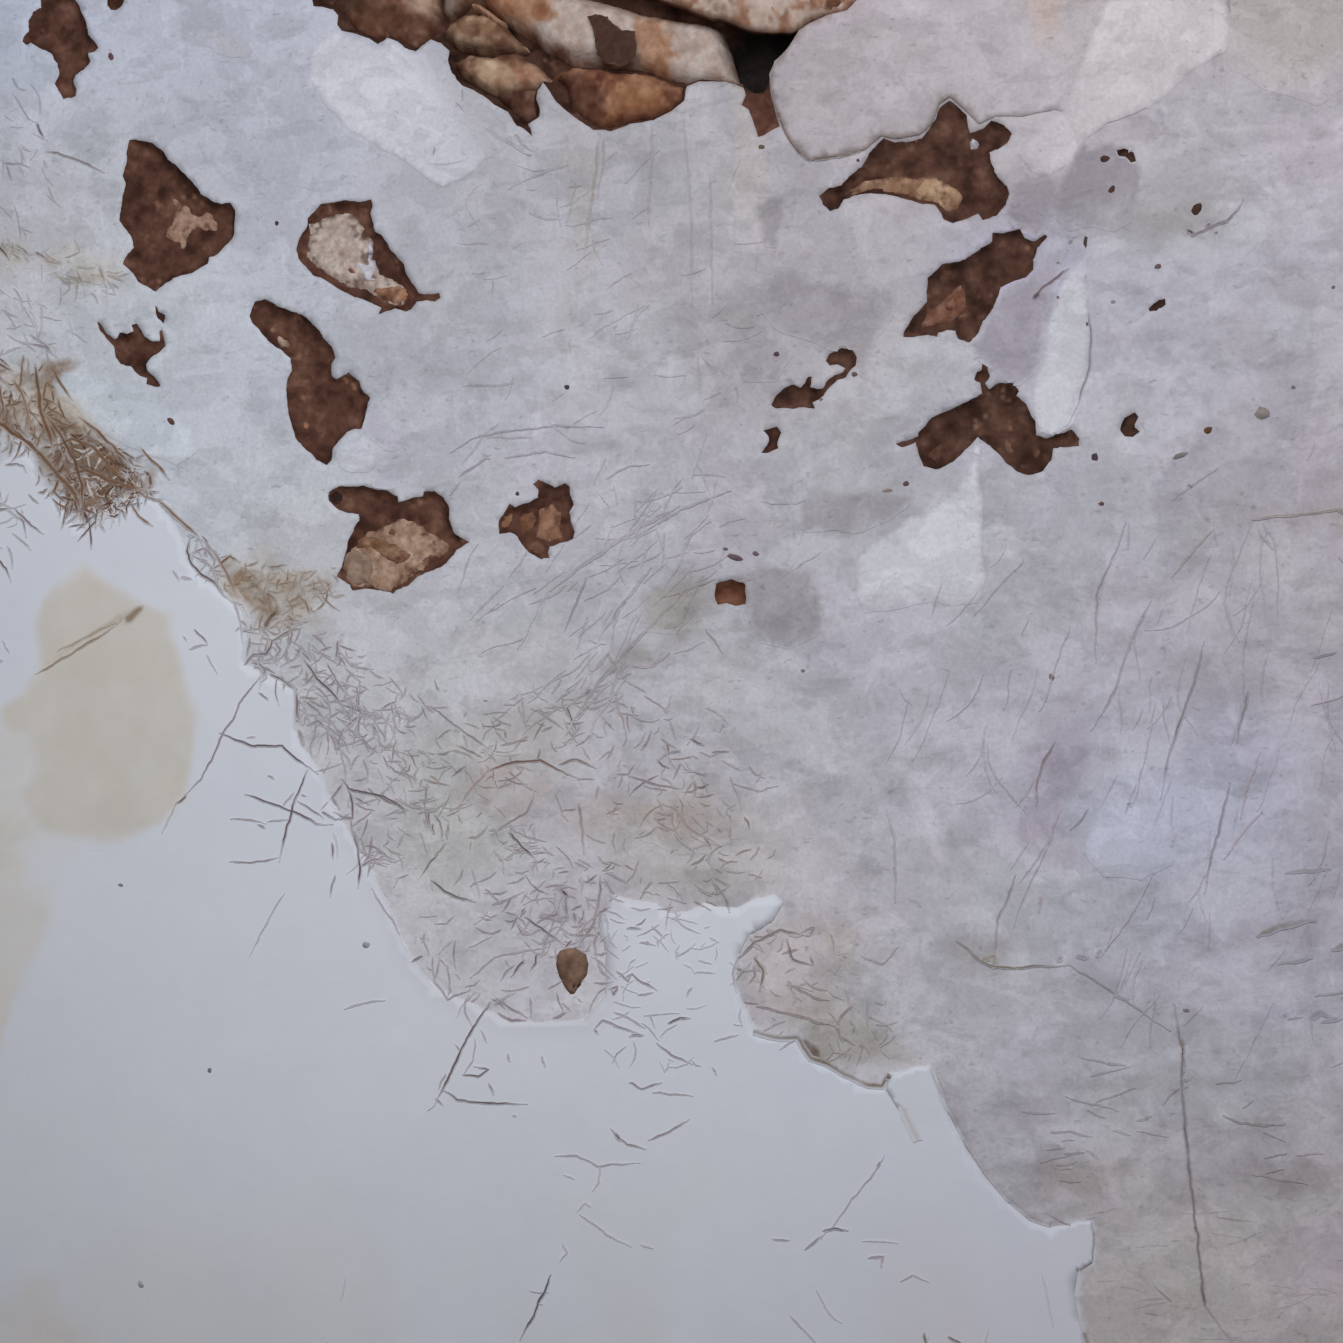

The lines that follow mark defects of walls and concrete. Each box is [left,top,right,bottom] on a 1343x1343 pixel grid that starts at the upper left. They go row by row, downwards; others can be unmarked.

spalling [22,0,114,99]
spalling [309,0,796,187]
spalling [51,140,235,465]
spalling [296,199,440,314]
peeling [797,0,1343,613]
spalling [250,299,469,594]
crack [0,560,12,582]
leakage [0,560,204,1055]
peeling [0,444,1343,1343]
leakage [0,1263,105,1343]
crack [790,1290,842,1343]
crack [922,1329,988,1343]